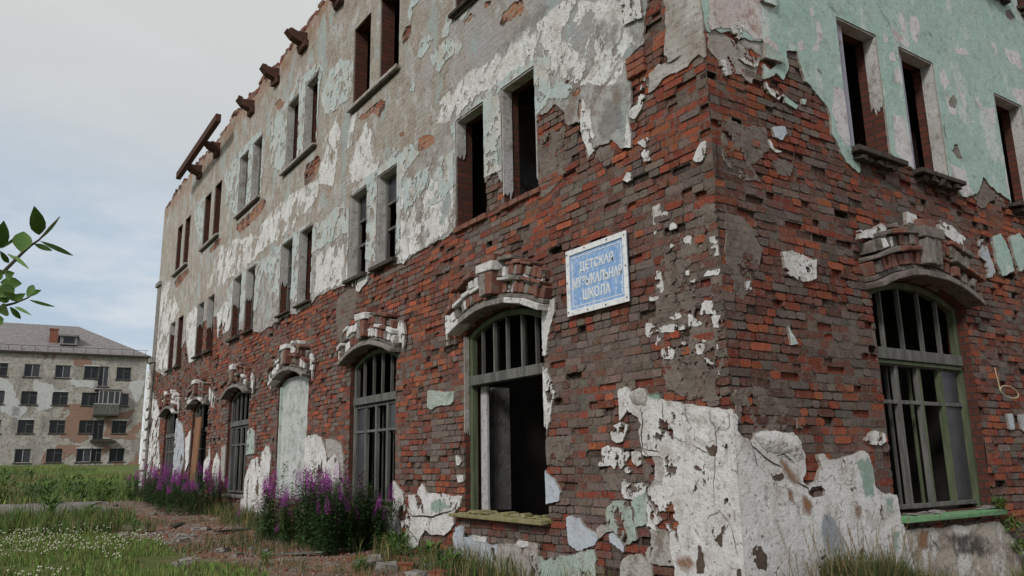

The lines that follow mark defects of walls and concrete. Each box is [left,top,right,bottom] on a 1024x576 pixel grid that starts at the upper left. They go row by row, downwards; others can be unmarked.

flaking render [194,0,644,343]
flaking render [624,78,652,162]
flaking render [693,141,708,163]
peeling [765,126,787,153]
peeling [893,114,914,168]
flaking render [156,268,198,370]
flaking render [0,377,192,480]
flaking render [240,428,272,518]
flaking render [303,434,345,532]
crack [640,408,737,552]
flaking render [385,204,1024,576]
crack [748,438,829,522]